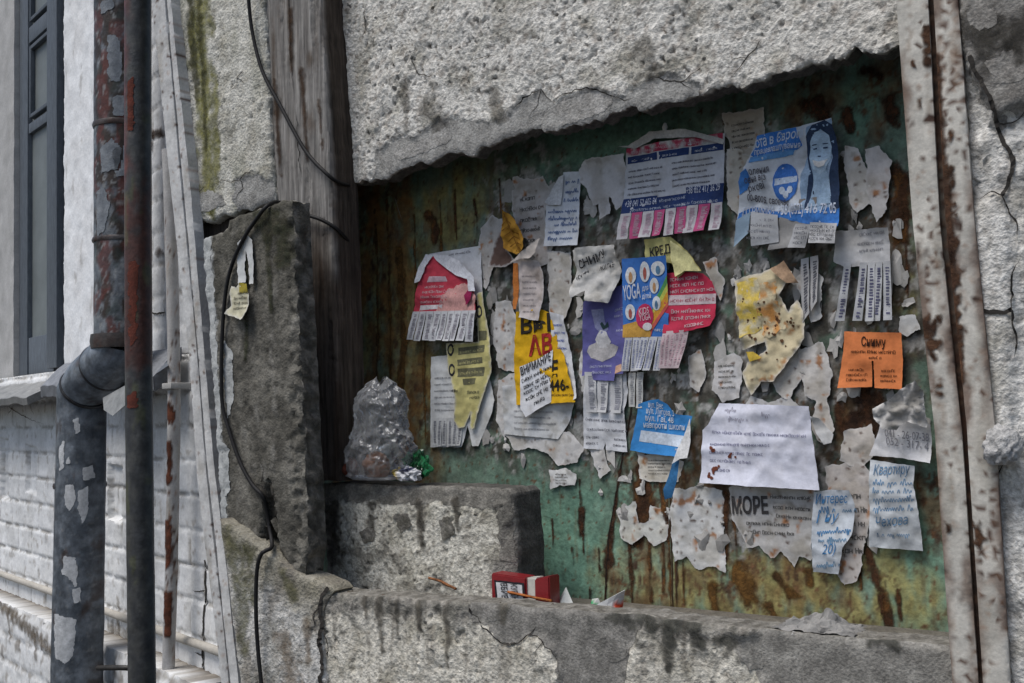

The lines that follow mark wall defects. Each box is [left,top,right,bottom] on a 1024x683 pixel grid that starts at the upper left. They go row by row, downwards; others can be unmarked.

peeling [100,138,124,177]
peeling [107,35,135,131]
water stain [188,0,207,151]
spalling [374,71,700,180]
corrosion [911,25,965,384]
crack [968,55,1024,232]
crack [984,259,1020,357]
corrosion [834,387,885,434]
water stain [415,498,425,548]
corrosion [598,465,685,603]
crack [312,587,329,683]
water stain [605,613,737,672]